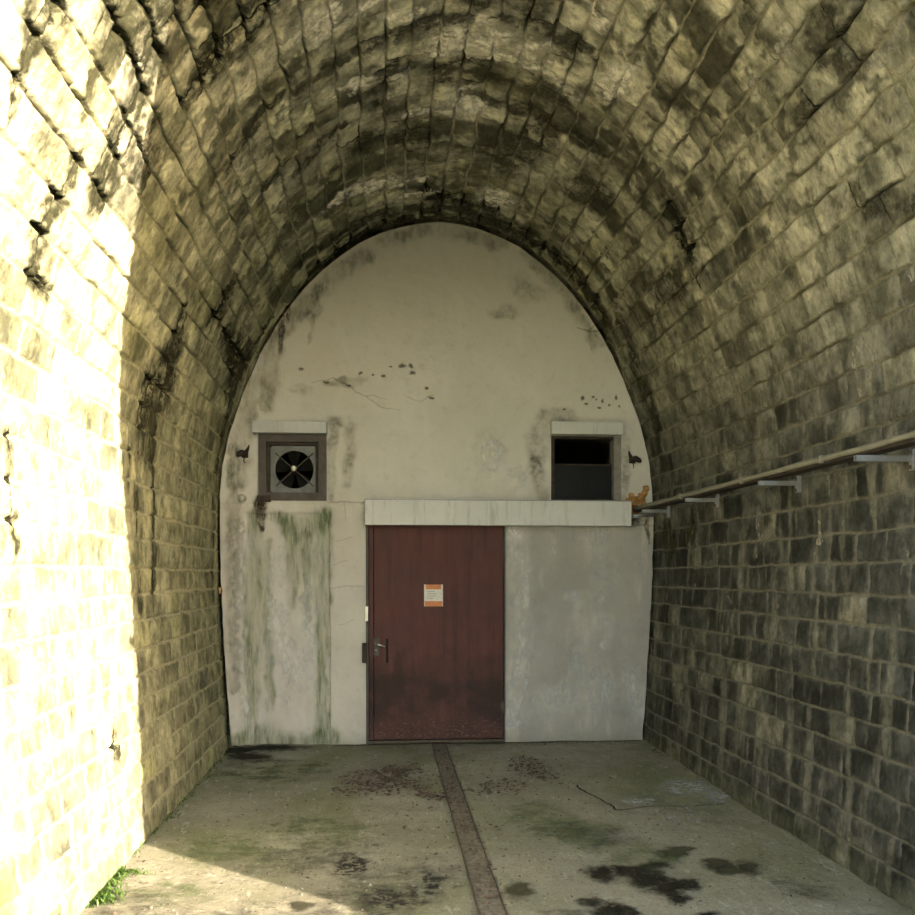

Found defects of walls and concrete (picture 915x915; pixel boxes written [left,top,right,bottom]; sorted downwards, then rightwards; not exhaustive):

crack [23,0,279,301]
crack [660,199,696,264]
crack [137,275,252,439]
crack [3,428,21,563]
rust [254,498,266,532]
crack [576,785,647,813]